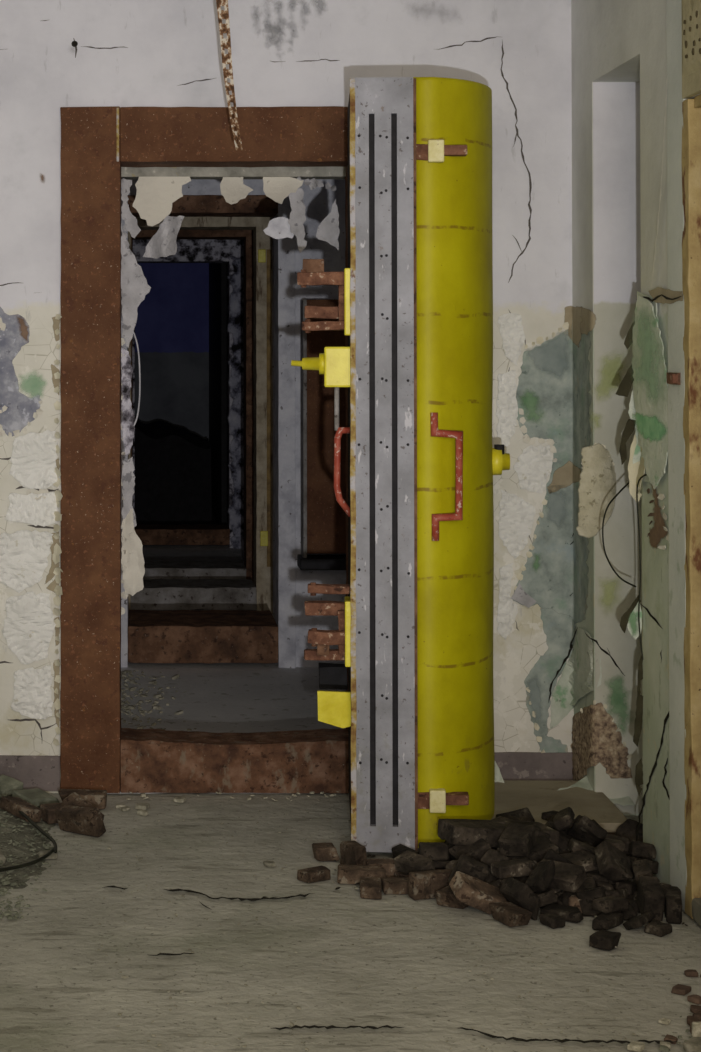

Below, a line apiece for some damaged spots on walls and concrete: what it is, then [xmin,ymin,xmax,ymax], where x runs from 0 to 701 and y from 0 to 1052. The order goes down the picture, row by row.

crack [441,37,532,283]
peeling [220,176,340,253]
peeling [616,287,683,550]
peeling [0,307,63,746]
peeling [496,306,643,795]
crack [586,634,625,676]
crack [641,604,662,660]
crack [636,712,670,841]
crack [164,889,315,910]
crack [270,1023,403,1031]
crack [459,1027,677,1044]